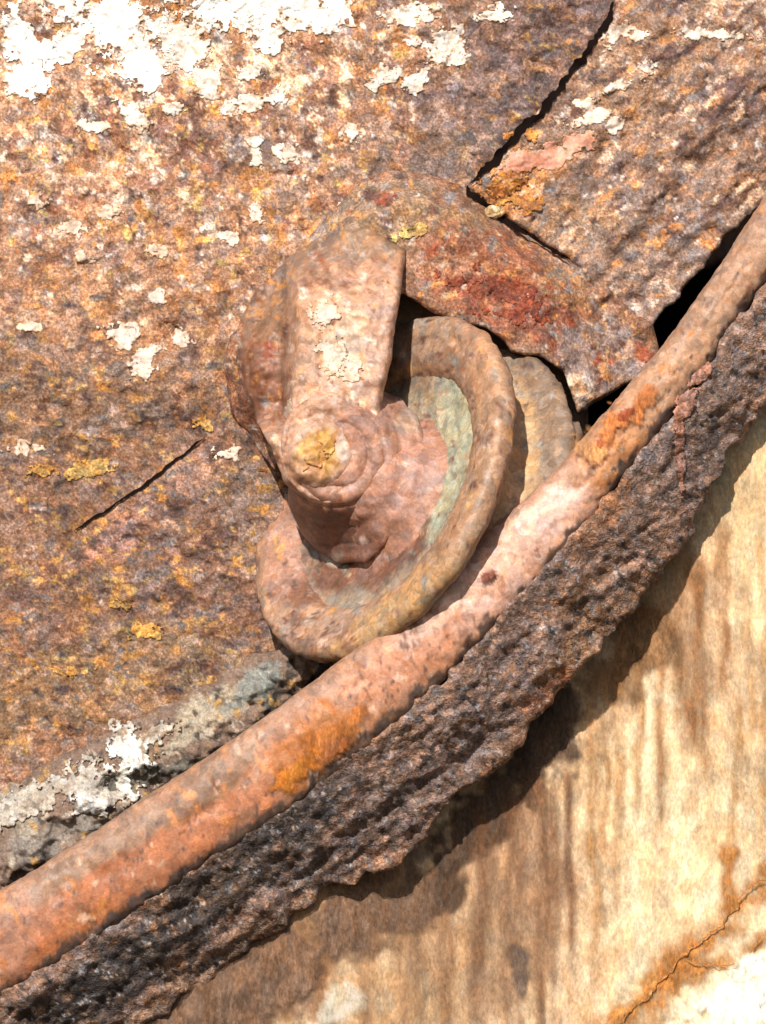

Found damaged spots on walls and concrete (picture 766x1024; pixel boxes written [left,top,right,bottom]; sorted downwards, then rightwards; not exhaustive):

peeling [0,0,363,135]
peeling [246,136,302,167]
peeling [338,122,366,146]
crack [466,2,614,261]
corrosion [434,262,553,329]
corrosion [23,457,119,481]
crack [74,437,205,531]
corrosion [563,384,658,482]
efflorescence [0,717,181,834]
corrosion [269,704,368,795]
leakage [157,602,677,1024]
crack [618,880,766,1024]